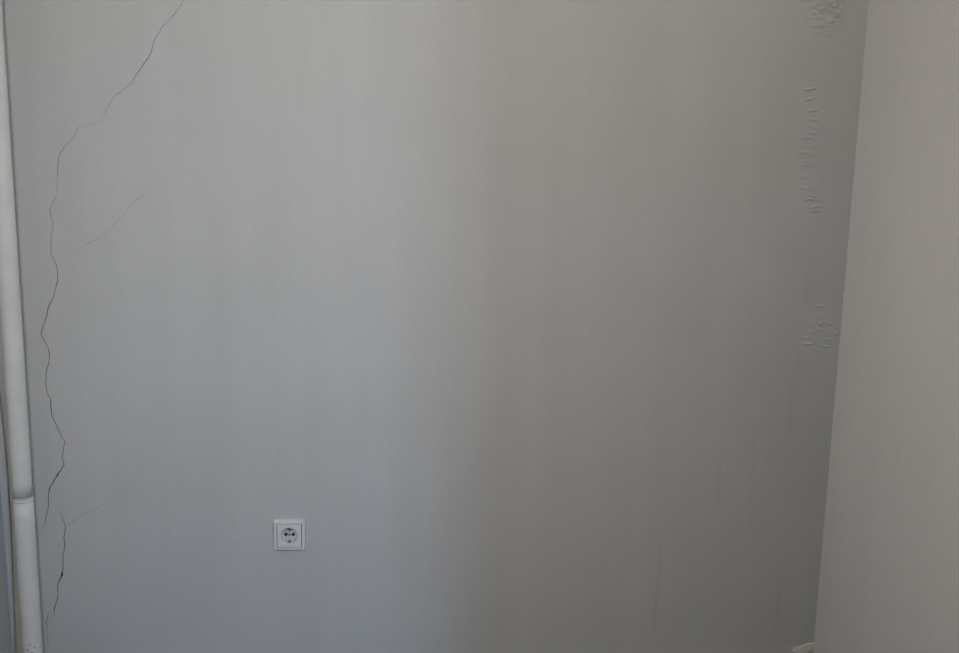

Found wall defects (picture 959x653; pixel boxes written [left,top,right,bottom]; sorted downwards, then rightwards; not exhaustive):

crack [41,127,93,642]